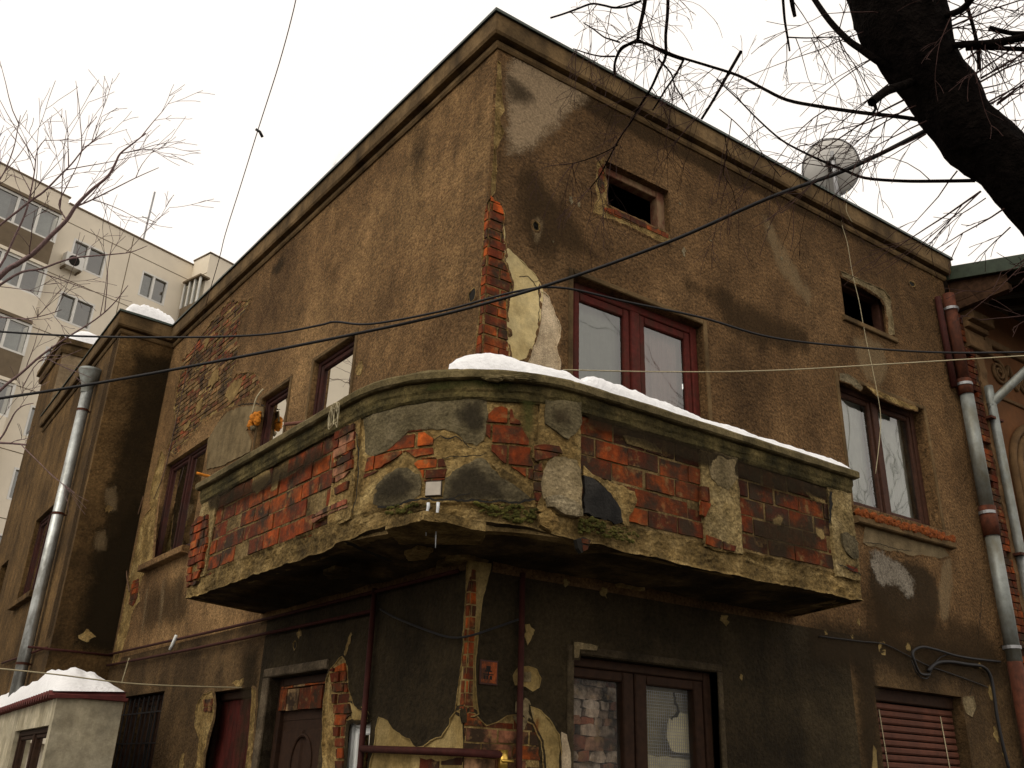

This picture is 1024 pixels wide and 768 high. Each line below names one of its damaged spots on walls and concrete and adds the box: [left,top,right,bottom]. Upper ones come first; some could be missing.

leakage [510,80,531,100]
flaking render [474,57,588,370]
spalling [569,157,686,257]
flaking render [112,294,263,668]
spalling [310,399,637,561]
spalling [699,452,738,518]
flaking render [705,535,736,553]
spalling [78,629,96,642]
flaking render [278,560,571,768]
flaking render [179,688,216,768]